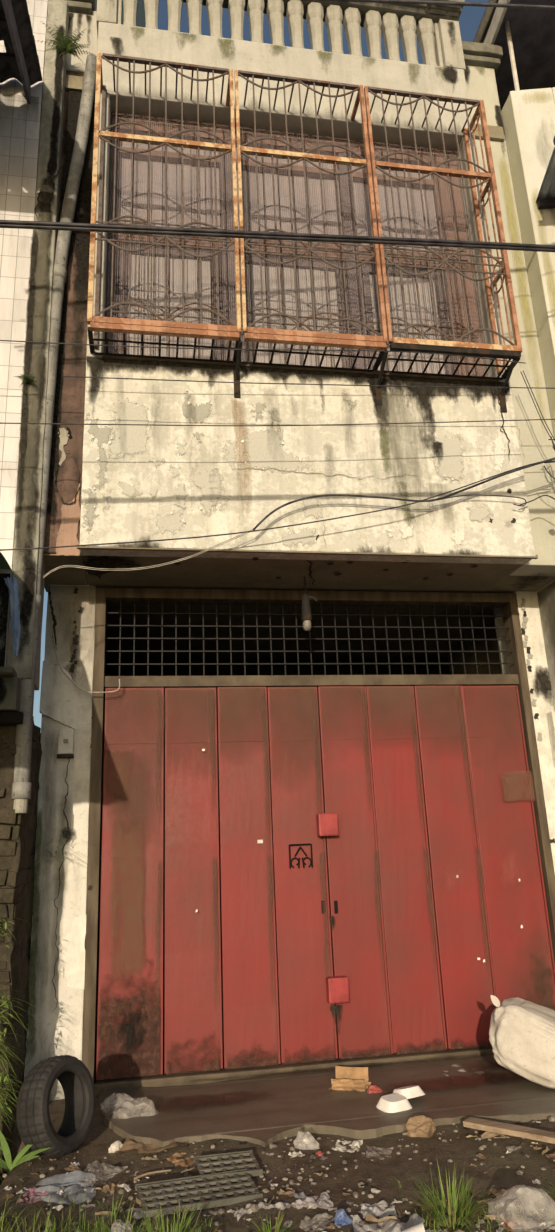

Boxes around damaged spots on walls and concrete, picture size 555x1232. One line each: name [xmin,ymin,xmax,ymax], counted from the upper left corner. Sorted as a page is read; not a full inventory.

leakage [0,12,510,702]
spalling [69,588,84,673]
crack [52,759,70,1010]